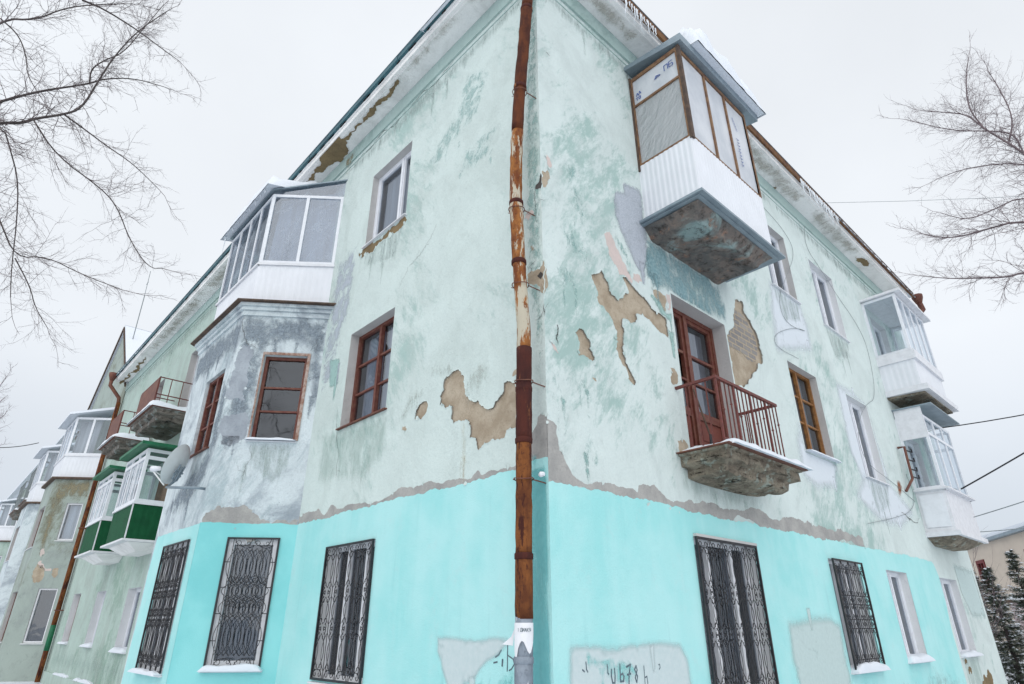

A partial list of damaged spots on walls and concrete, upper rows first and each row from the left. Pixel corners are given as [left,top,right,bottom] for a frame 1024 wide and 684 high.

flaking render [306,79,400,182]
flaking render [359,216,407,259]
flaking render [527,244,548,294]
flaking render [590,184,678,386]
flaking render [574,327,597,382]
flaking render [726,298,763,388]
flaking render [402,368,516,451]
peeling [201,464,516,529]
peeling [532,412,866,550]